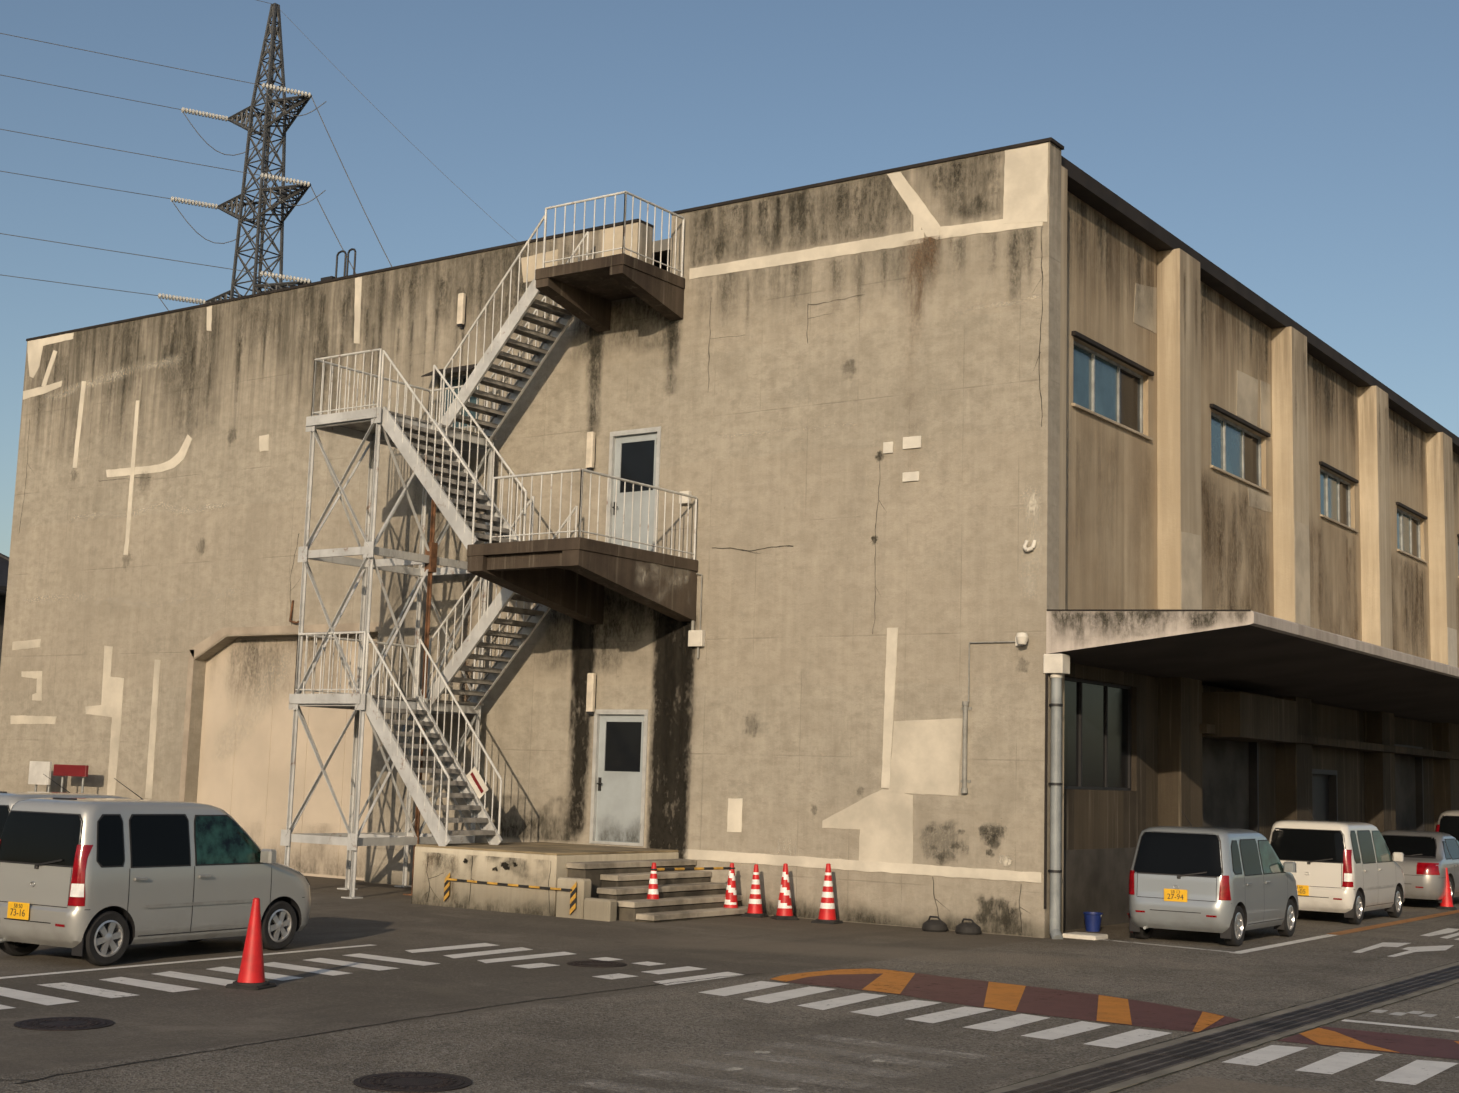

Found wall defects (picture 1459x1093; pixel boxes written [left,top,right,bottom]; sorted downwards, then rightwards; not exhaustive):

leakage [693,176,895,261]
leakage [928,154,991,216]
leakage [482,245,528,319]
crack [870,466,886,634]
leakage [493,592,695,859]
leakage [492,856,518,871]